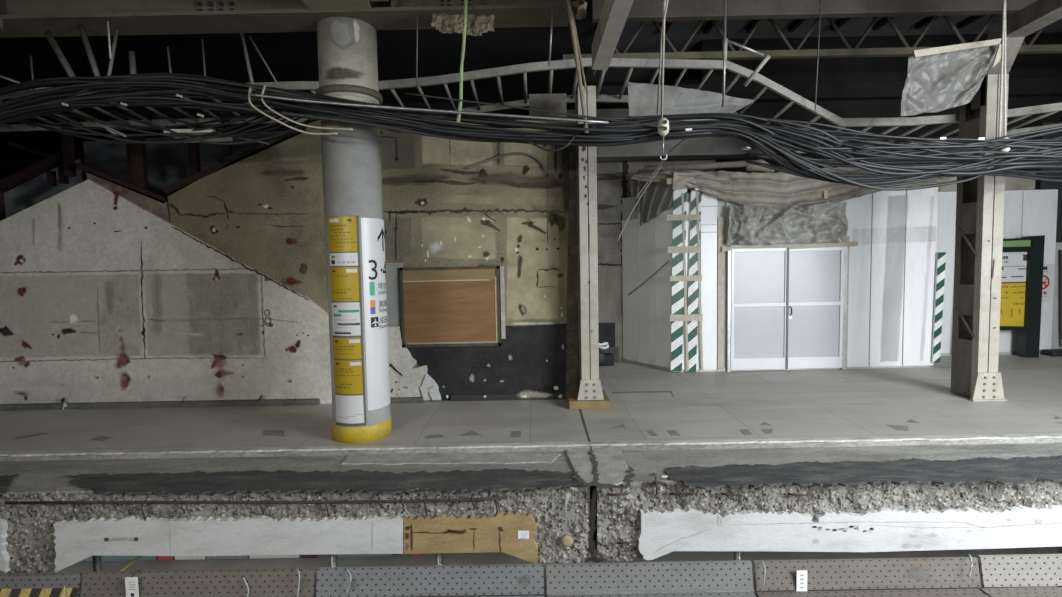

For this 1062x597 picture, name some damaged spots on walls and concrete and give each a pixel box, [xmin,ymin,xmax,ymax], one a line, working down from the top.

spalling [573,0,587,20]
crack [0,196,308,362]
corrosion [0,326,32,367]
corrosion [118,338,131,388]
corrosion [211,355,232,396]
flaking render [388,326,449,400]
spalling [518,386,562,398]
spalling [0,473,1062,574]
crack [572,446,635,563]